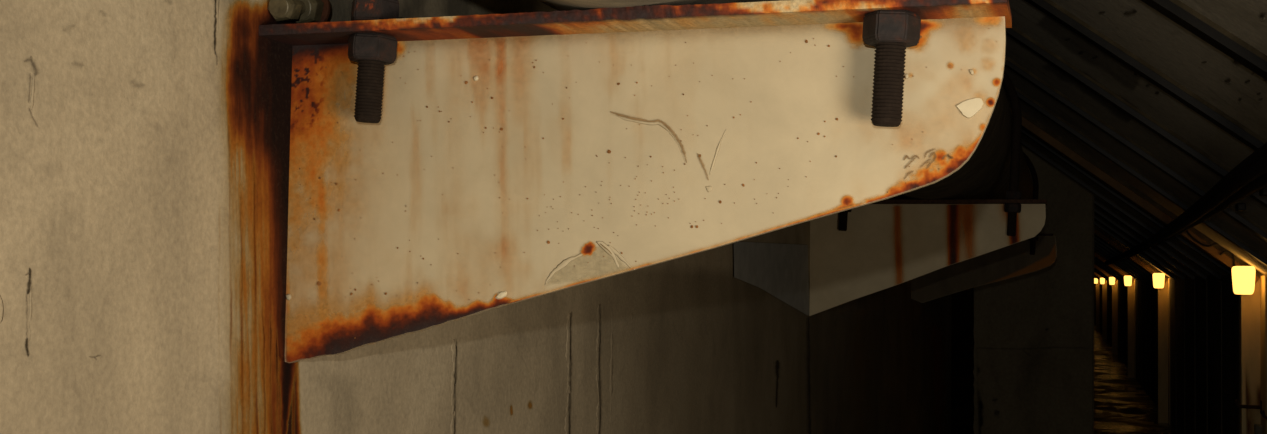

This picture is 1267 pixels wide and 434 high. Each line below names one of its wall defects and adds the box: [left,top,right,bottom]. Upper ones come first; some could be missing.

rust [986,78,1001,107]
rust [222,0,542,434]
rust [684,124,1056,302]